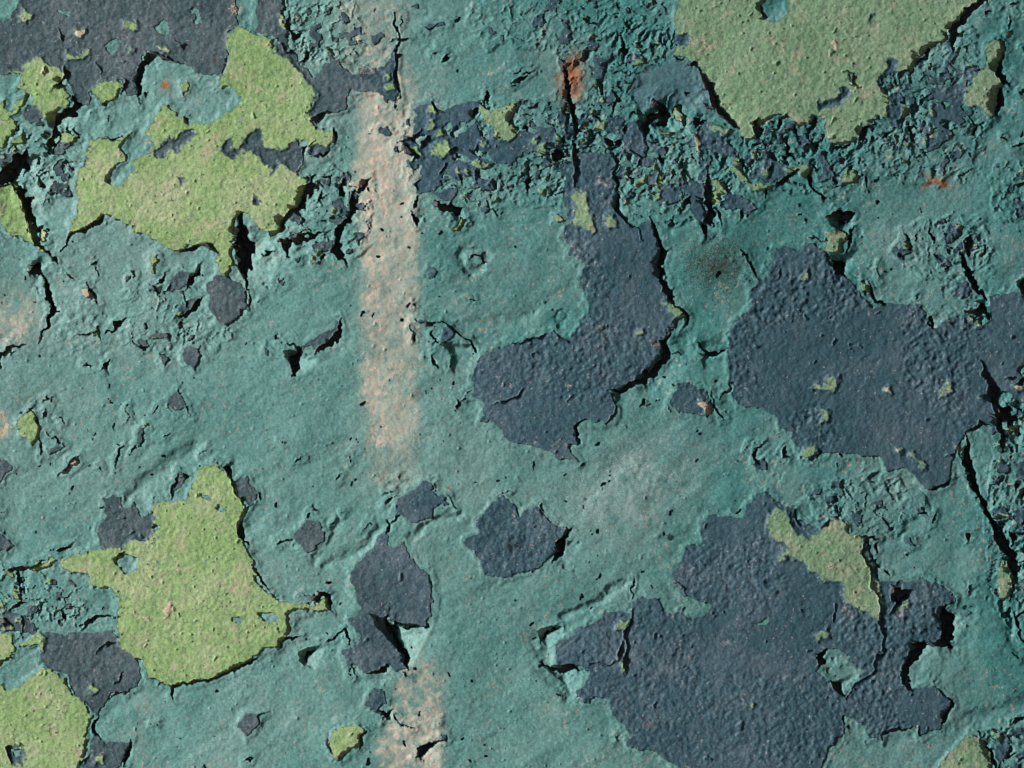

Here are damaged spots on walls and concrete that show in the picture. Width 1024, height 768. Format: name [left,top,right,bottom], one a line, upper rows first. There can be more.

corrosion [546,41,597,118]
crack [561,61,587,190]
crack [0,142,149,377]
peeling [0,0,1024,500]
peeling [0,458,342,768]
peeling [306,481,457,728]
peeling [463,490,581,578]
peeling [539,491,982,768]
crack [956,359,1024,659]